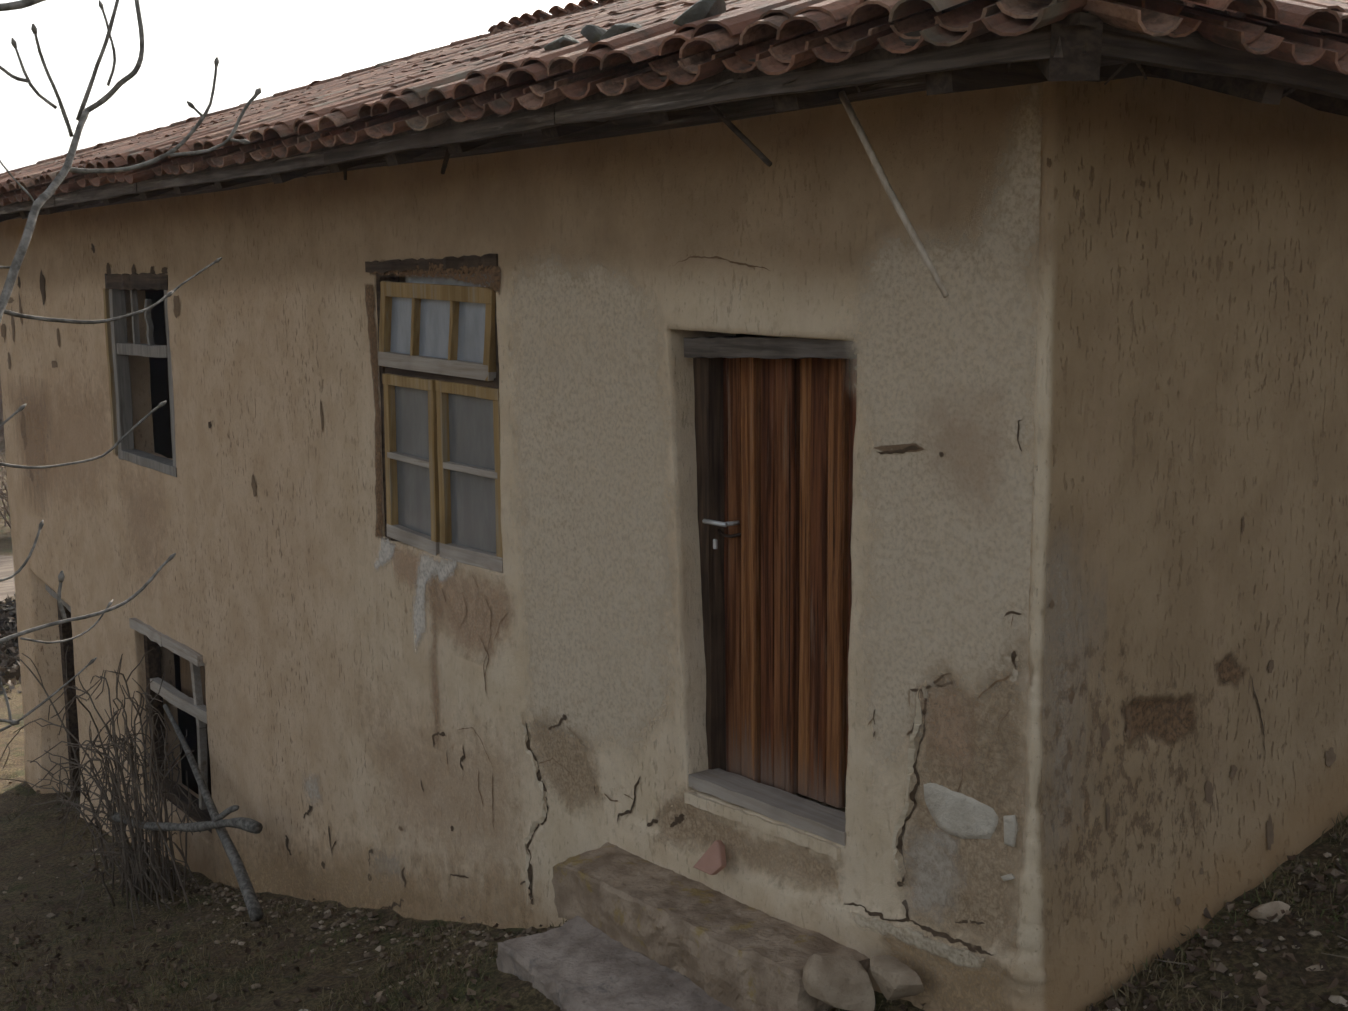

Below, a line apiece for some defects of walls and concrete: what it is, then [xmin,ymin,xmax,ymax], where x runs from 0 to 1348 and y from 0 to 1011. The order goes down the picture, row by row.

damp [413,556,456,724]
crack [421,727,494,827]
crack [520,718,685,905]
crack [844,611,1021,956]
flaking render [902,662,1024,949]